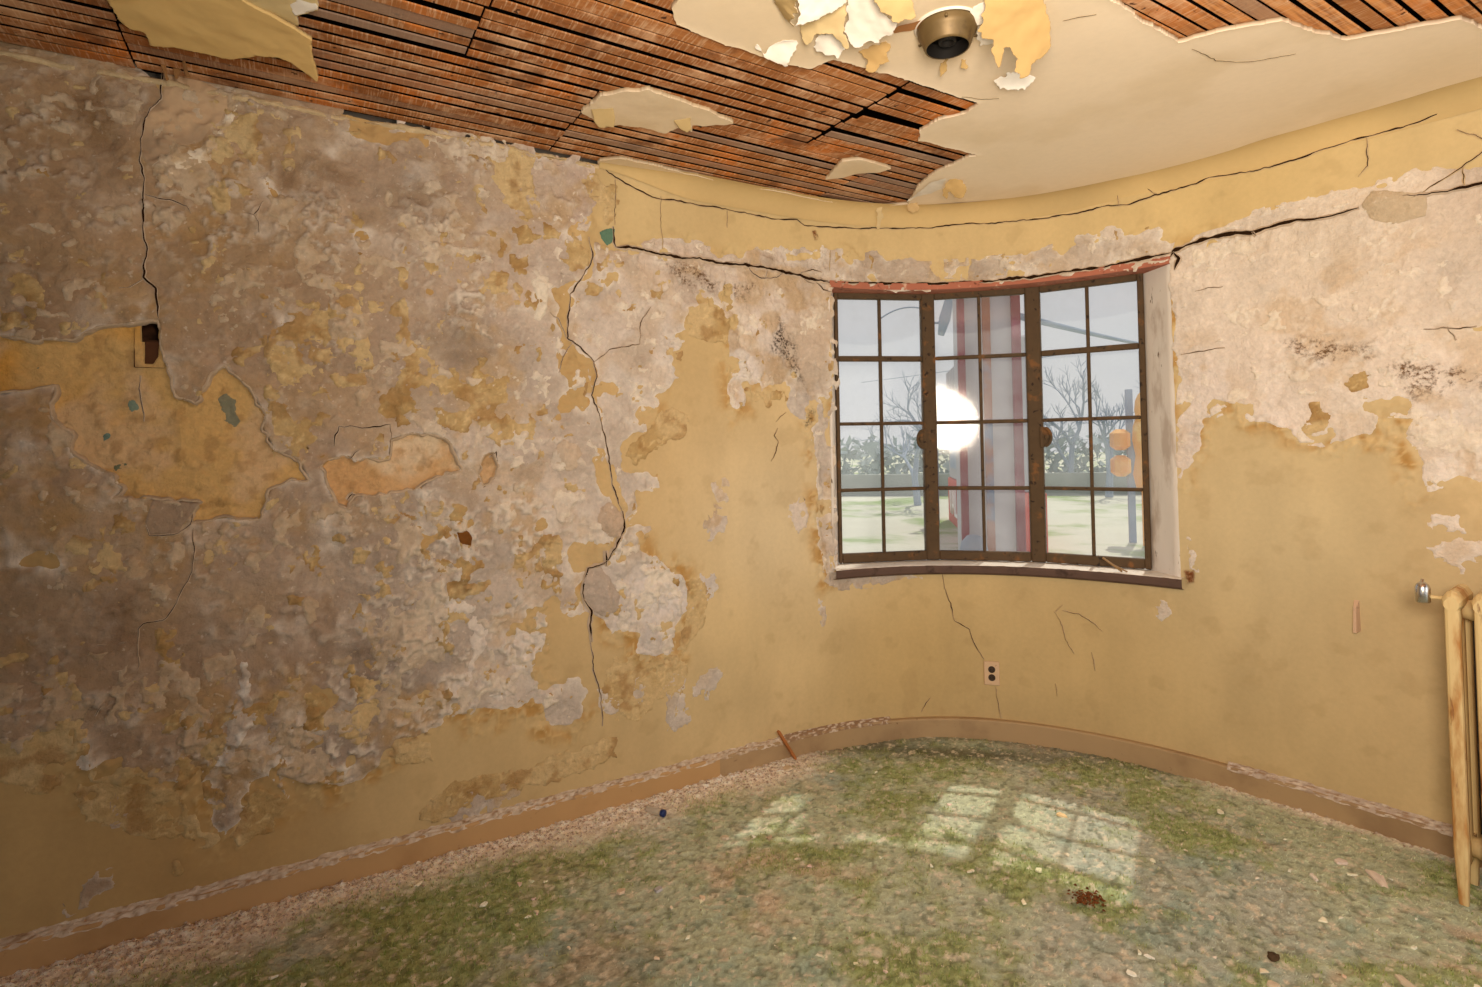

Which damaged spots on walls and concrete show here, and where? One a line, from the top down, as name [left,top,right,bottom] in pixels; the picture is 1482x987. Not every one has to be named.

crack [119,73,191,319]
water stain [152,88,253,232]
peeling [290,0,318,16]
water stain [209,160,493,407]
water stain [423,125,510,167]
peeling [0,32,940,835]
peeling [755,0,923,73]
peeling [970,0,1051,90]
crack [550,113,1482,726]
peeling [944,166,1482,492]
water stain [0,489,571,797]
water stain [587,510,684,655]